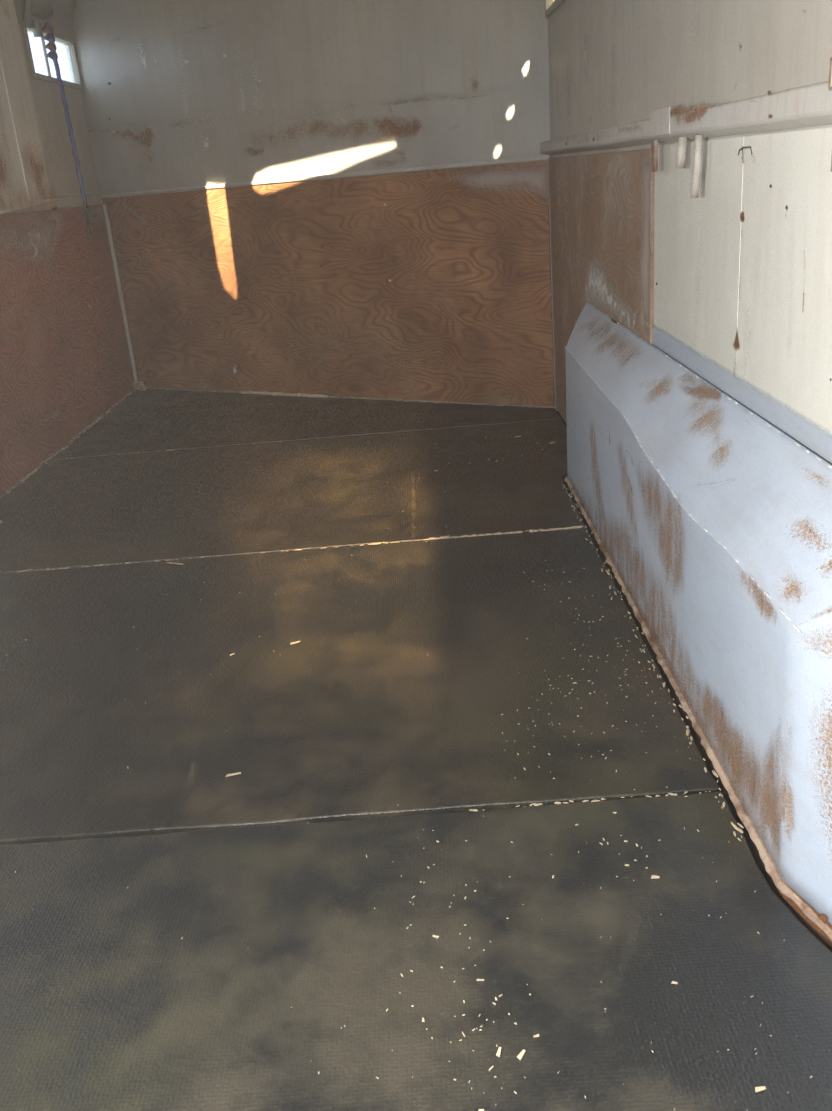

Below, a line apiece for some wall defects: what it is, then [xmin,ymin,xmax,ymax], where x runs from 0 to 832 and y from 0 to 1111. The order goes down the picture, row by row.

rust [670,104,707,123]
rust [685,374,720,428]
rust [795,520,832,573]
rust [587,431,792,845]
rust [815,704,832,831]
rust [779,885,832,943]